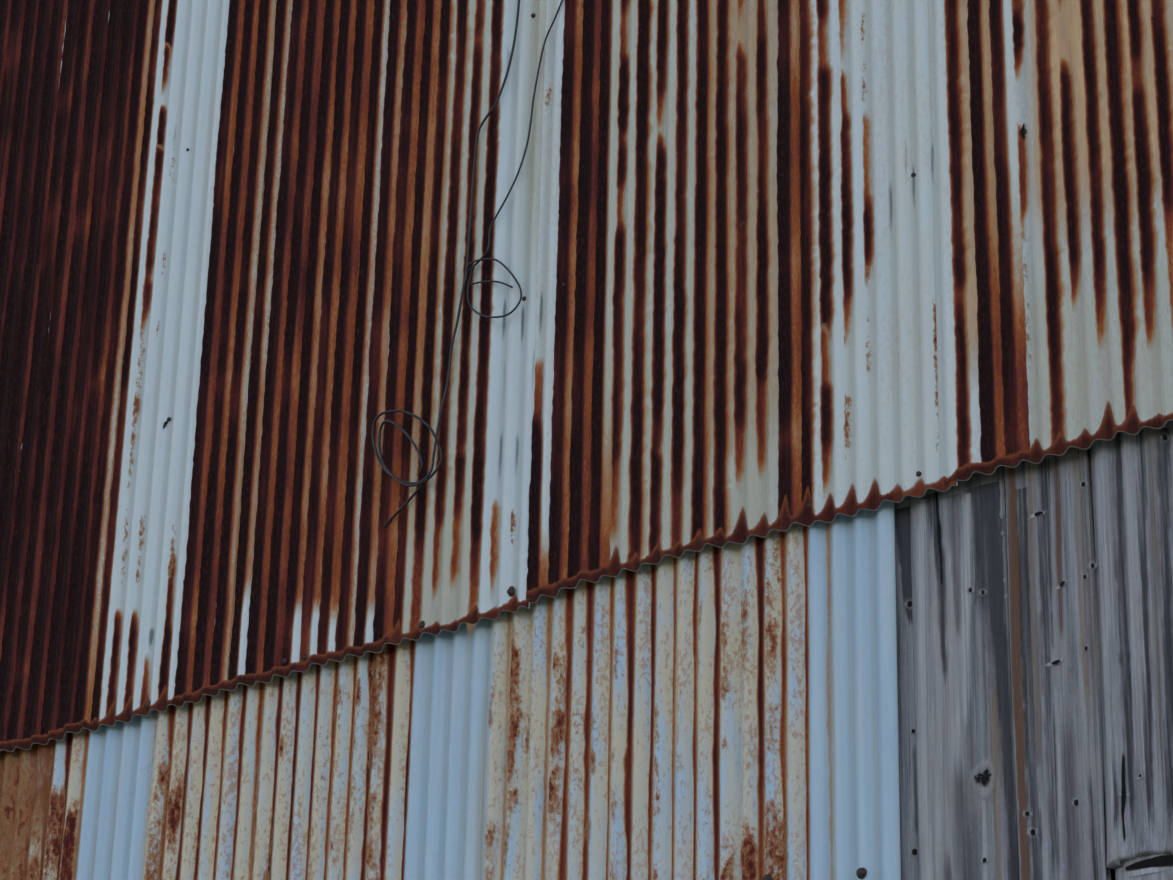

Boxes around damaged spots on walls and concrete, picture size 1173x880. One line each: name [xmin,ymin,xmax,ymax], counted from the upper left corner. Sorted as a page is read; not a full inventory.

rust [162,0,177,91]
rust [656,0,669,127]
rust [1012,0,1025,77]
rust [140,105,167,337]
rust [432,0,470,596]
rust [450,0,485,583]
rust [816,0,834,491]
rust [840,71,853,342]
rust [863,115,874,284]
rust [1018,125,1028,241]
rust [490,502,499,590]
rust [764,531,788,880]